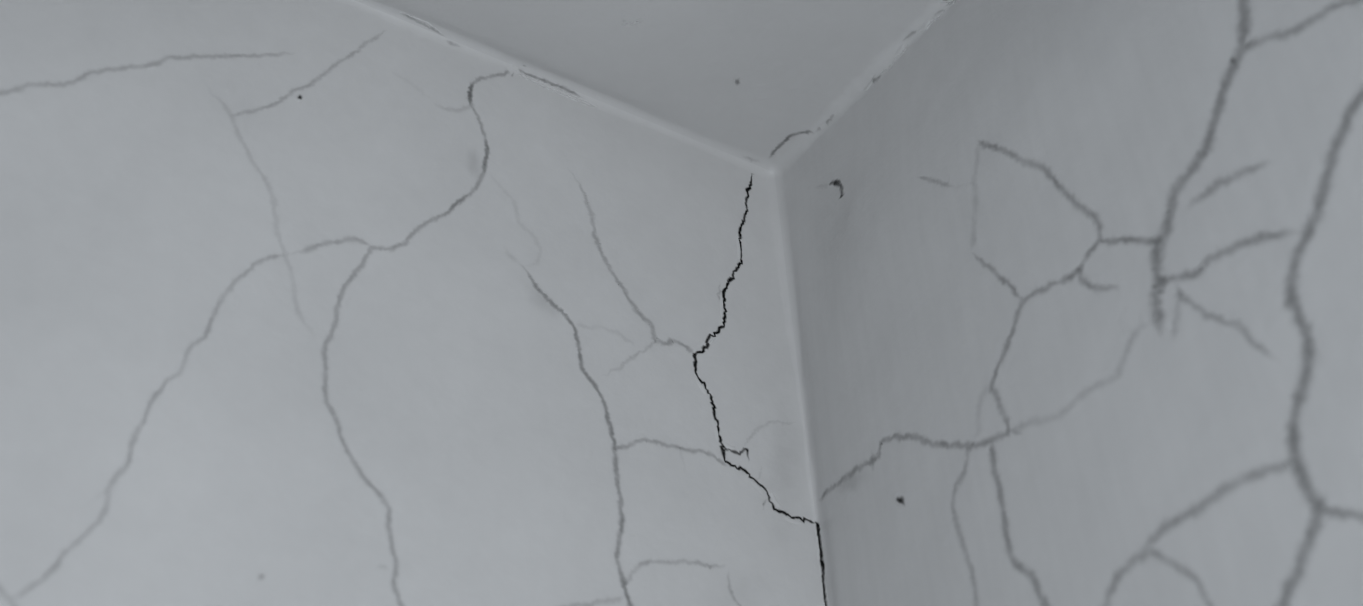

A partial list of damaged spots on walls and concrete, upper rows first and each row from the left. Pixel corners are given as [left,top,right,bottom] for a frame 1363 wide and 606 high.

crack [693,176,827,606]